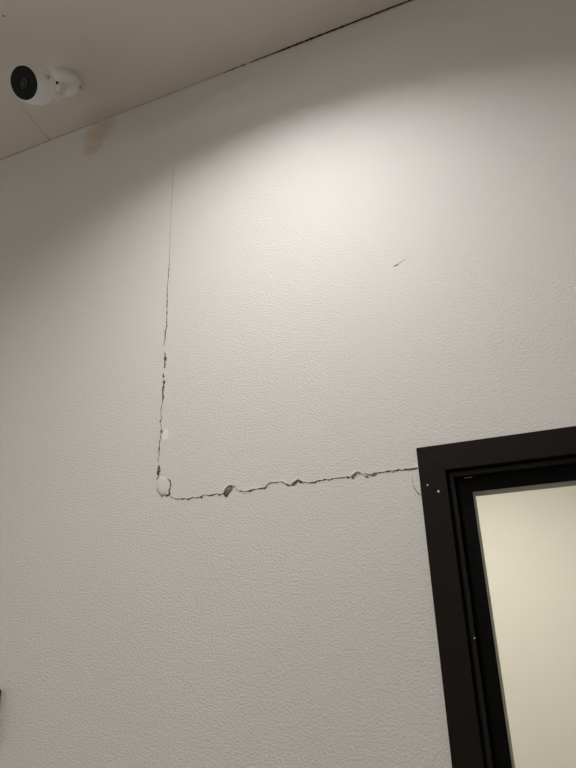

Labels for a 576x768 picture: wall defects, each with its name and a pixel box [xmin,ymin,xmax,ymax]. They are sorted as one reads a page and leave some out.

crack [156,182,173,480]
crack [169,466,421,501]